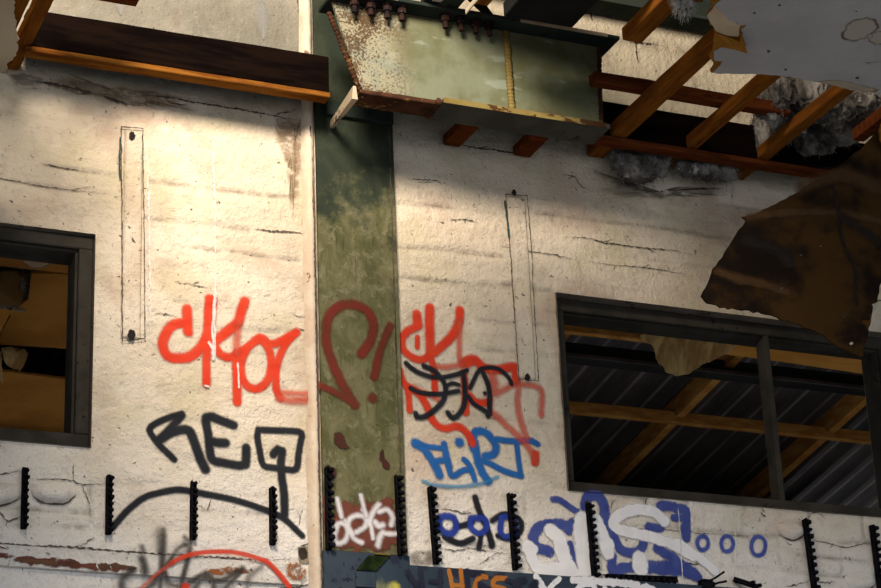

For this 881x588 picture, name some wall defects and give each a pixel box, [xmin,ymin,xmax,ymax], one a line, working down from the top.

leakage [841,17,881,45]
crack [36,81,311,136]
crack [0,159,324,588]